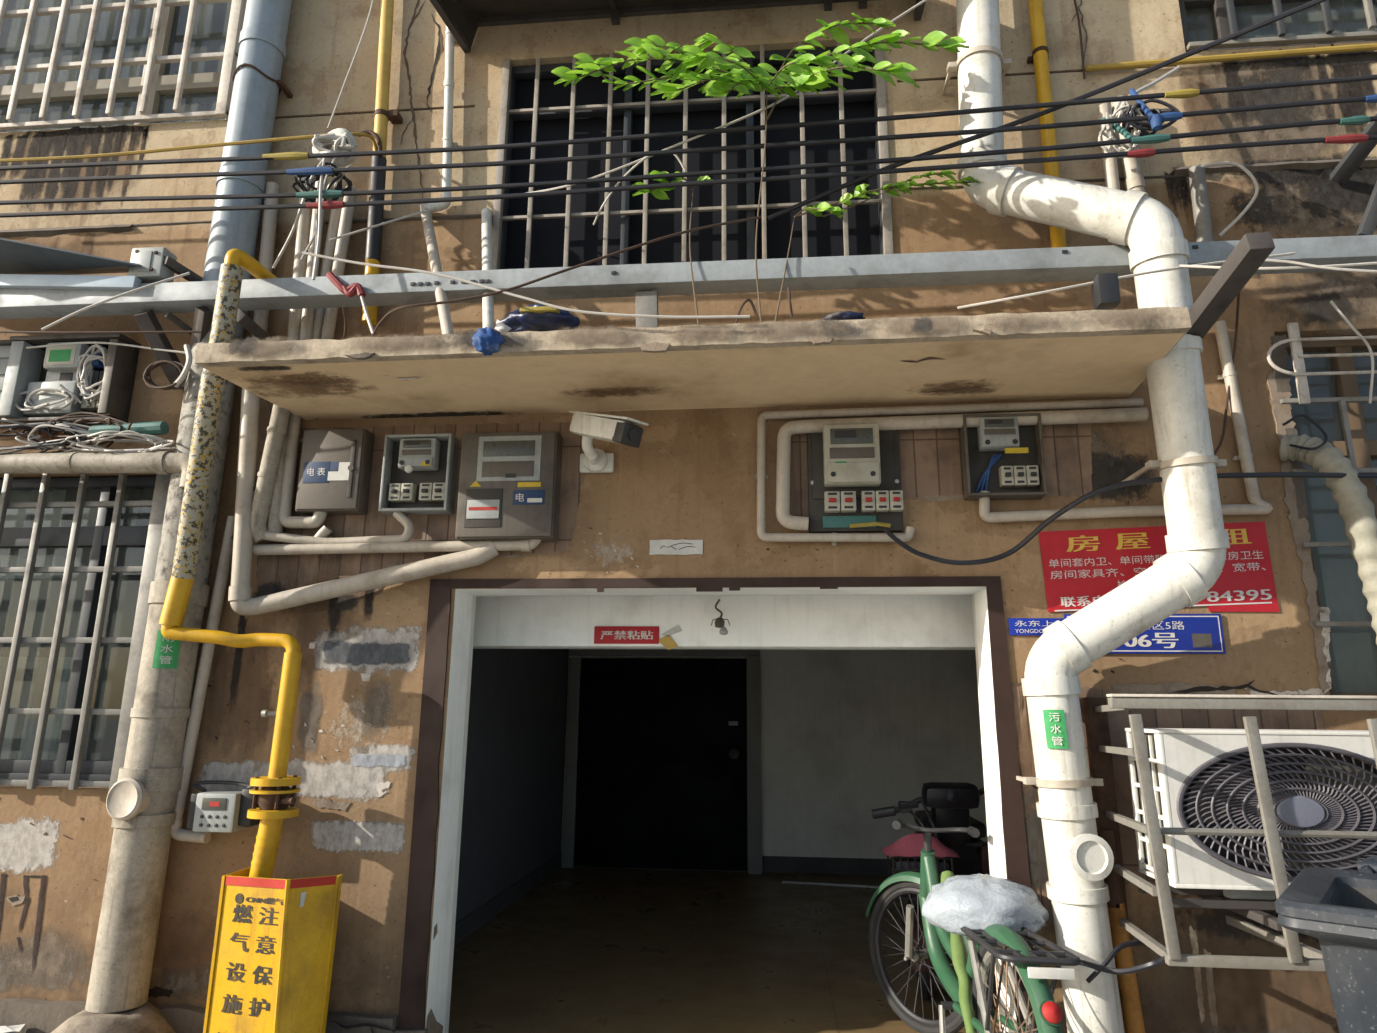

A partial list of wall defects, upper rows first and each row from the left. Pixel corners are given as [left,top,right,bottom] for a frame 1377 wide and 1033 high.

leakage [0,125,149,211]
crack [400,0,443,199]
leakage [1165,170,1192,209]
leakage [1184,44,1377,237]
peeling [200,760,270,791]
peeling [287,610,421,854]
leakage [0,873,88,992]